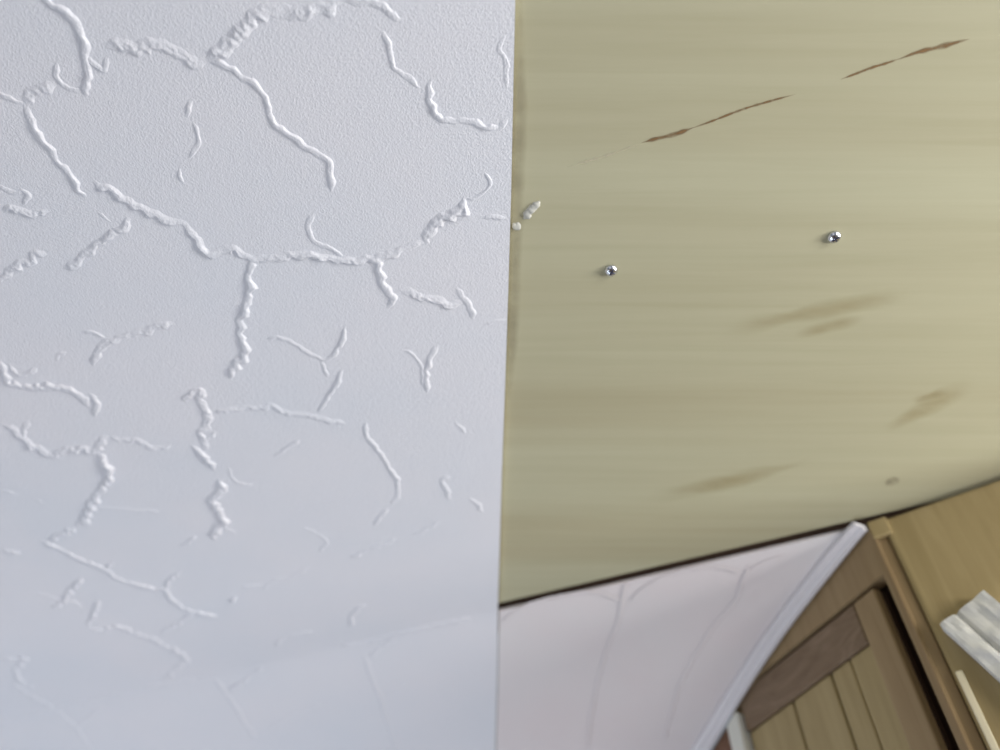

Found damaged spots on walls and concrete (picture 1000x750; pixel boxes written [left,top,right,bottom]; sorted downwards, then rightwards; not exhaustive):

crack [846,41,961,78]
crack [646,97,785,142]
crack [0,0,510,634]